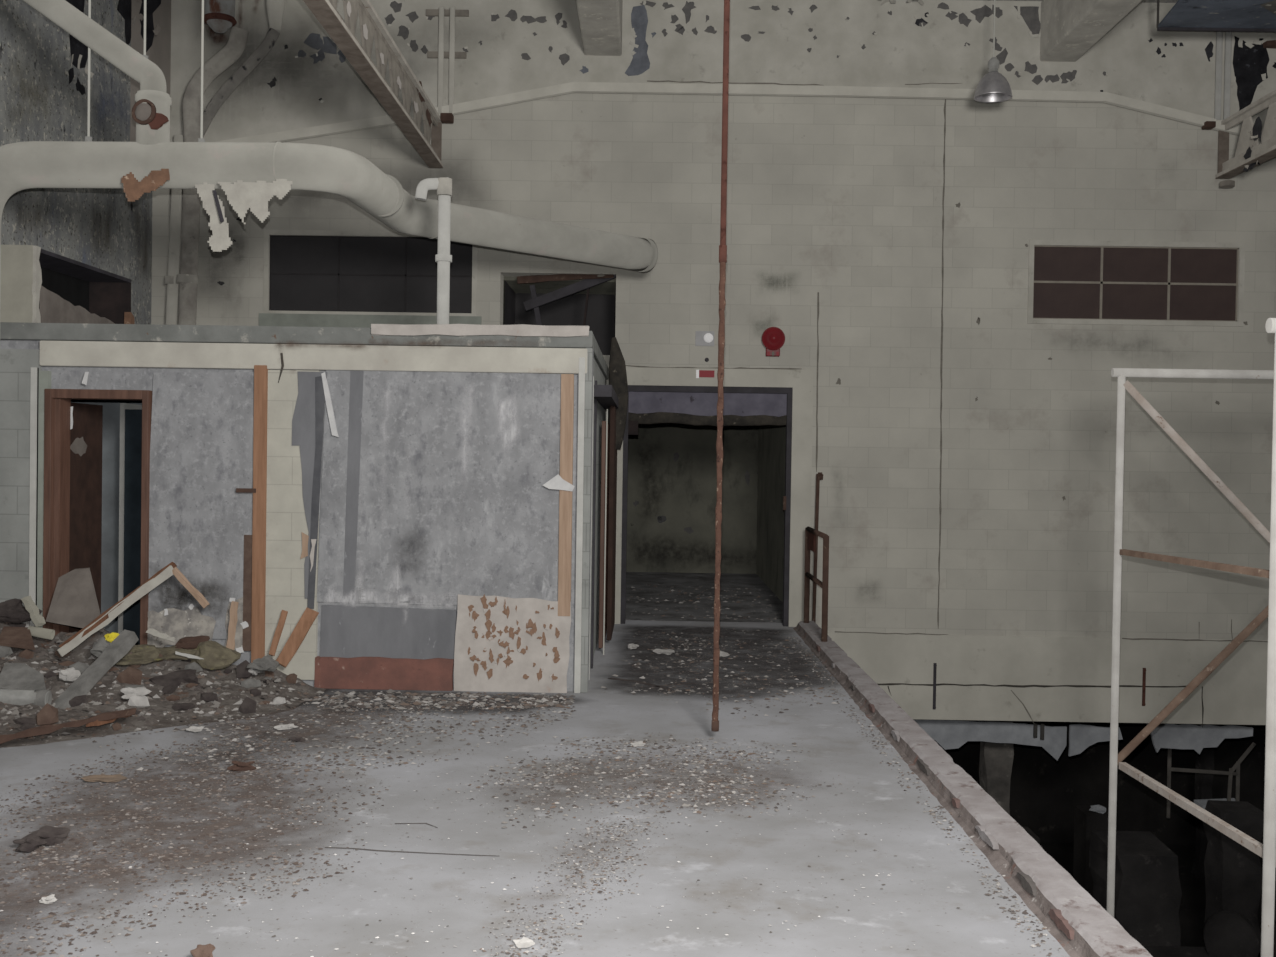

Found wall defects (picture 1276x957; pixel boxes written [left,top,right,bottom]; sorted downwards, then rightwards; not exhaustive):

peeling [66,0,85,13]
peeling [68,34,94,95]
peeling [117,0,161,52]
peeling [625,1,717,76]
peeling [881,0,1041,38]
peeling [1231,32,1276,172]
spalling [913,719,1266,845]
spalling [1016,872,1037,896]
spalling [1048,909,1075,940]